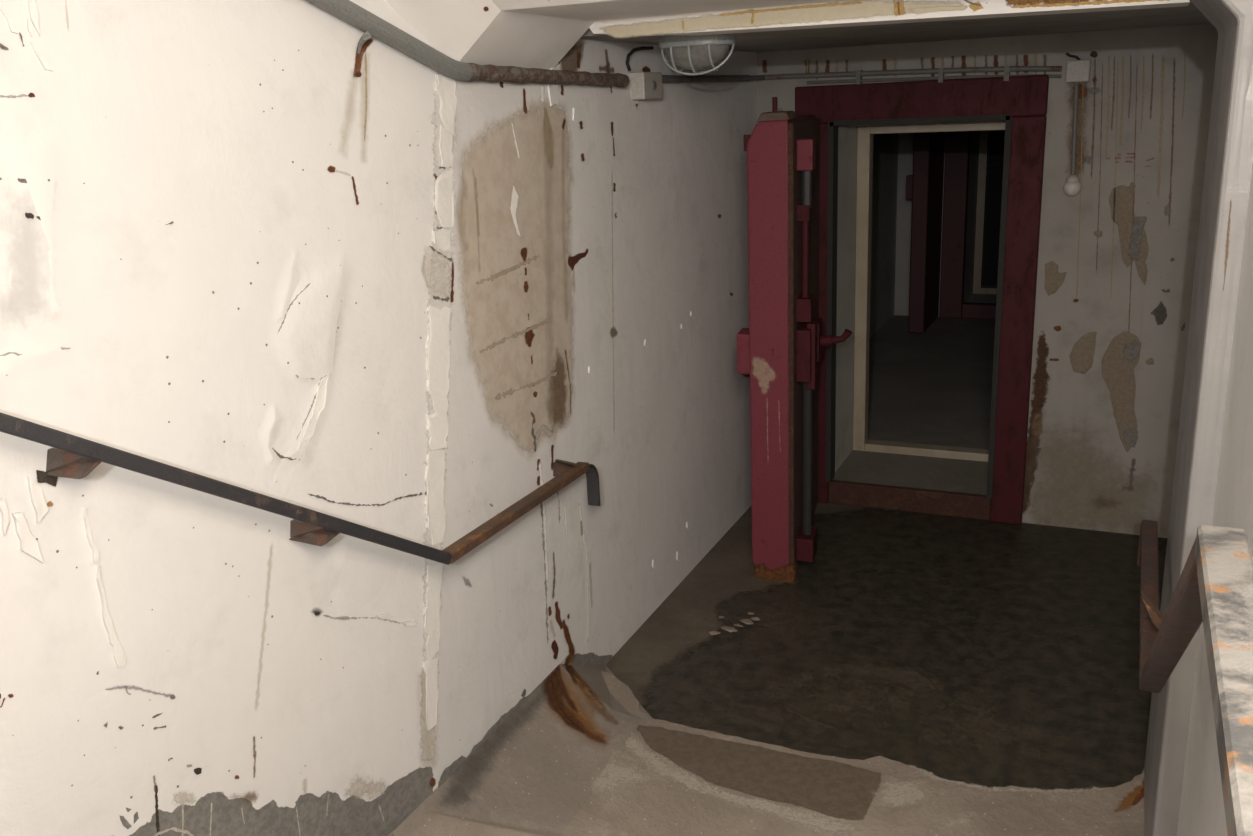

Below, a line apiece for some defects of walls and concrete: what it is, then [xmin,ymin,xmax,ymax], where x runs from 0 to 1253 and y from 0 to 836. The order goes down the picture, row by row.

corrosion [894,0,983,16]
corrosion [1006,0,1168,8]
corrosion [559,43,583,71]
crack [0,91,35,99]
corrosion [523,83,544,114]
peeling [1109,182,1149,285]
spalling [1151,289,1170,325]
peeling [1069,331,1154,452]
corrosion [1023,326,1061,512]
peeling [120,73,613,836]
crack [309,492,427,506]
corrosion [545,552,618,743]